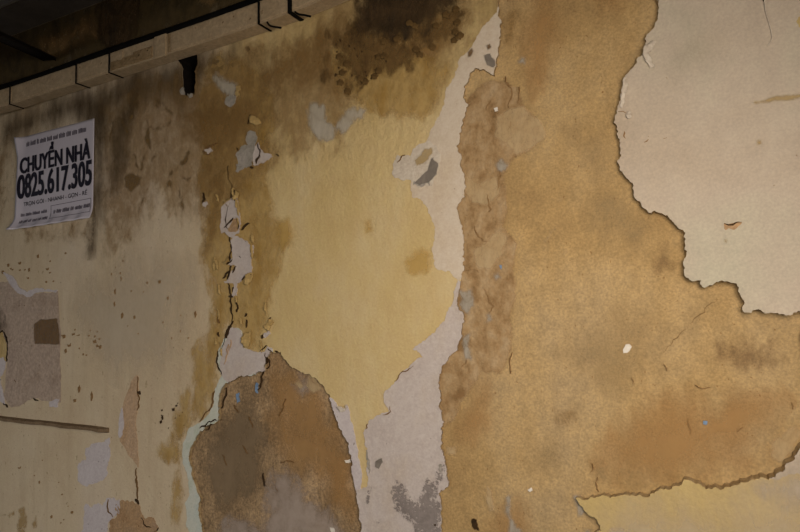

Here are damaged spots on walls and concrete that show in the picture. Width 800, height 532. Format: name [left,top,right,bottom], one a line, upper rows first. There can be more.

leakage [0,0,244,85]
leakage [48,67,186,191]
peeling [0,260,102,408]
leakage [96,272,166,355]
leakage [159,0,467,464]
flaking render [182,0,800,532]
peeling [77,375,141,487]
peeling [81,497,159,532]